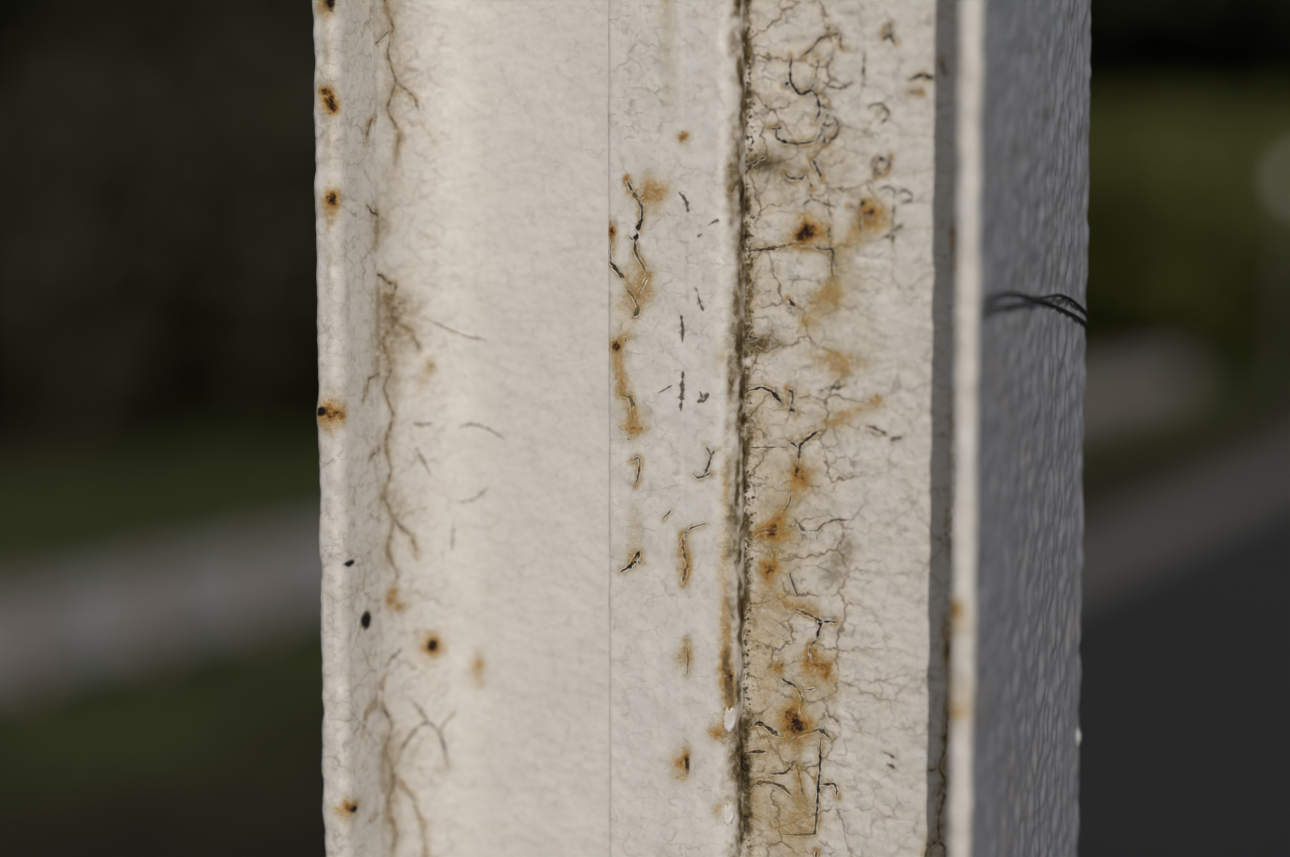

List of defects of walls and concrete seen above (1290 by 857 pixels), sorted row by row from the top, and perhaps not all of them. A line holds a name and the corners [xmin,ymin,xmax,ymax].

rust [318,85,340,115]
rust [323,189,340,217]
crack [609,174,650,319]
rust [789,212,826,251]
crack [678,23,947,293]
crack [362,271,505,591]
rust [610,333,645,440]
crack [620,287,710,423]
rust [421,634,442,657]
crack [743,384,854,857]
rust [778,696,814,810]
crack [922,698,951,857]